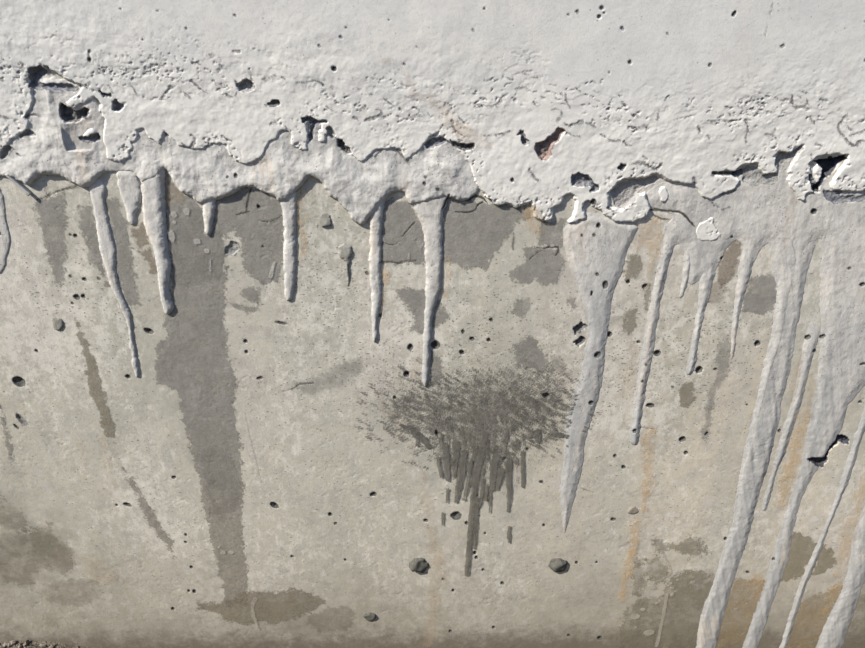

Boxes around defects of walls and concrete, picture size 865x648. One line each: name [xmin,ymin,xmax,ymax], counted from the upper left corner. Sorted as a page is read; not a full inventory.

spalling [15,62,90,92]
spalling [60,103,89,122]
spalling [302,117,352,153]
spalling [484,93,631,160]
spalling [571,172,599,192]
spalling [710,114,865,204]
damp [32,193,157,305]
damp [442,197,535,273]
damp [74,320,115,438]
damp [154,173,325,625]
damp [355,336,605,576]
damp [781,532,836,582]